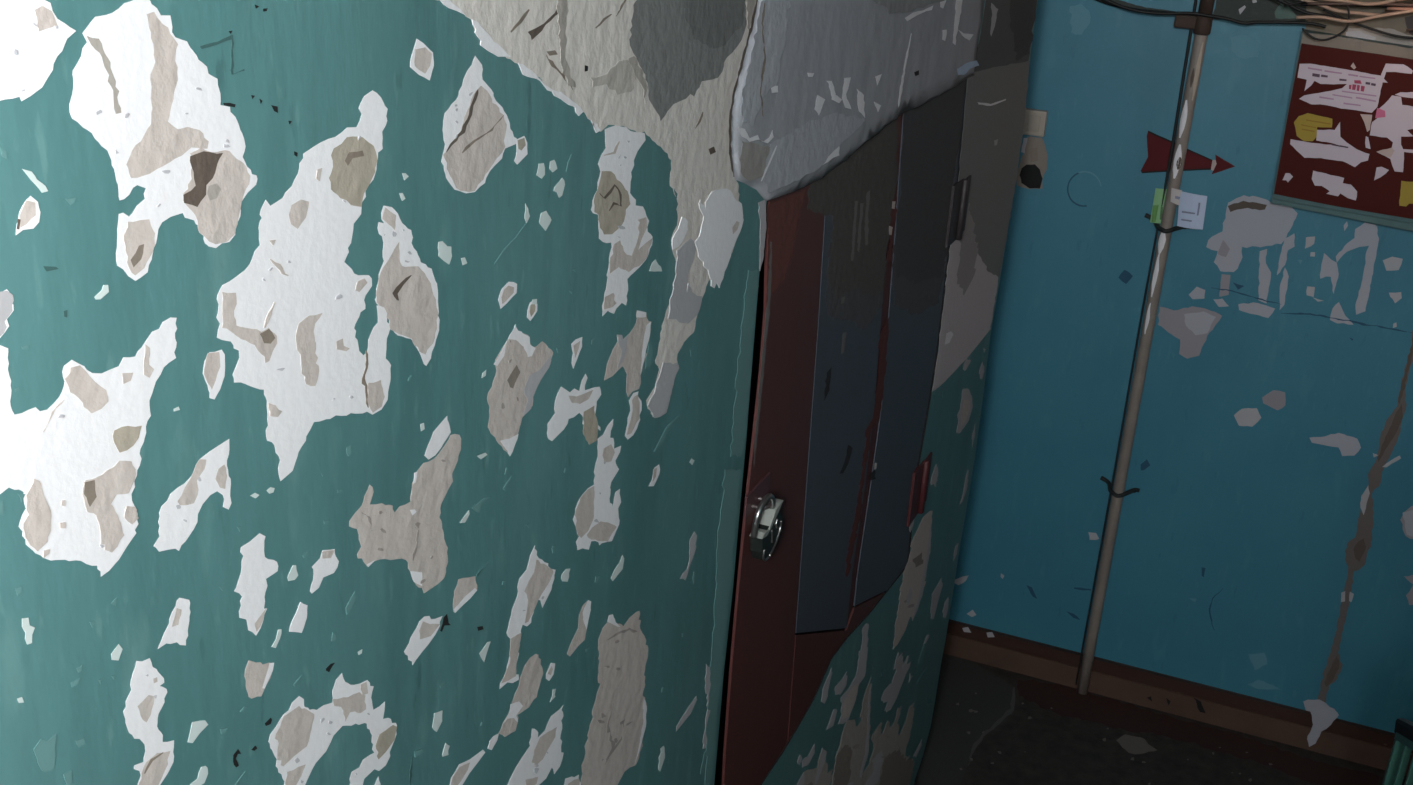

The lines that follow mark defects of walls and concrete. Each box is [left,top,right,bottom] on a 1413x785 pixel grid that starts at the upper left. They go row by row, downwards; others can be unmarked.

peeling [0,0,257,281]
peeling [410,39,434,80]
peeling [0,289,177,576]
peeling [111,598,208,785]
peeling [154,439,232,552]
peeling [234,533,339,699]
peeling [268,673,397,785]
peeling [203,90,467,498]
flaking render [349,416,477,665]
flaking render [432,0,766,785]
peeling [1144,195,1403,359]
crack [1211,287,1413,703]